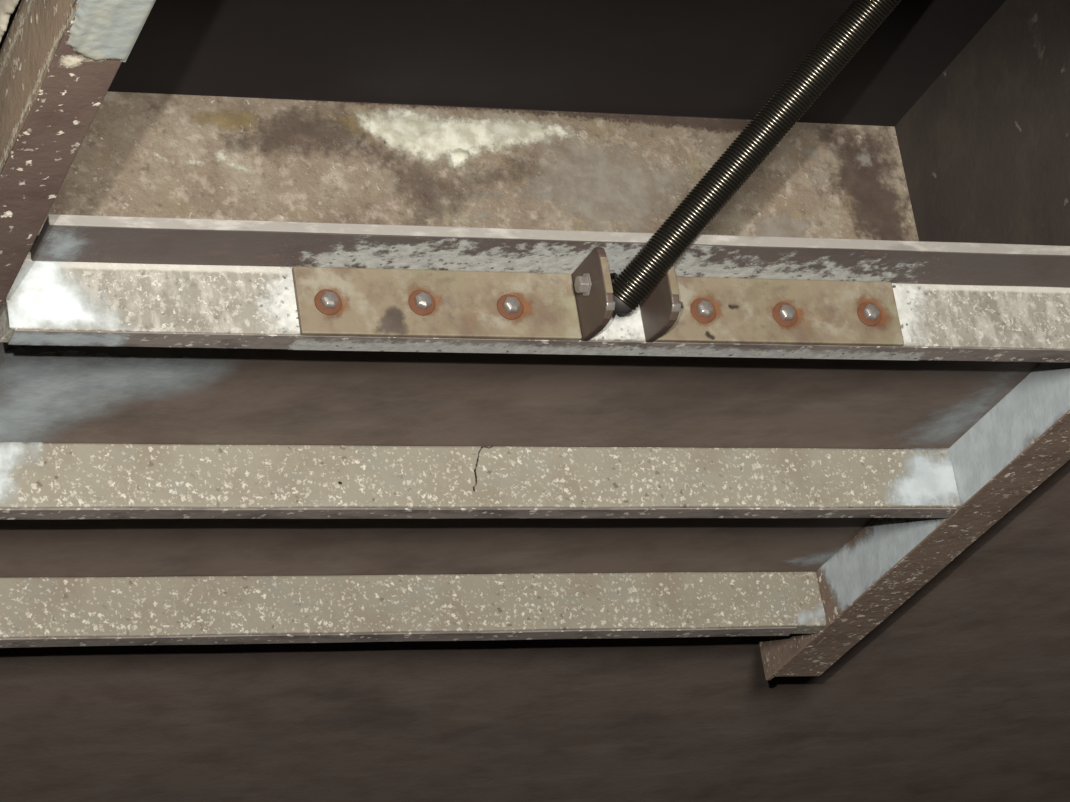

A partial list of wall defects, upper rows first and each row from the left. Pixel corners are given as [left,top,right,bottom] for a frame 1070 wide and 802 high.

leakage [0,0,99,171]
leakage [356,102,750,228]
crack [473,446,493,491]